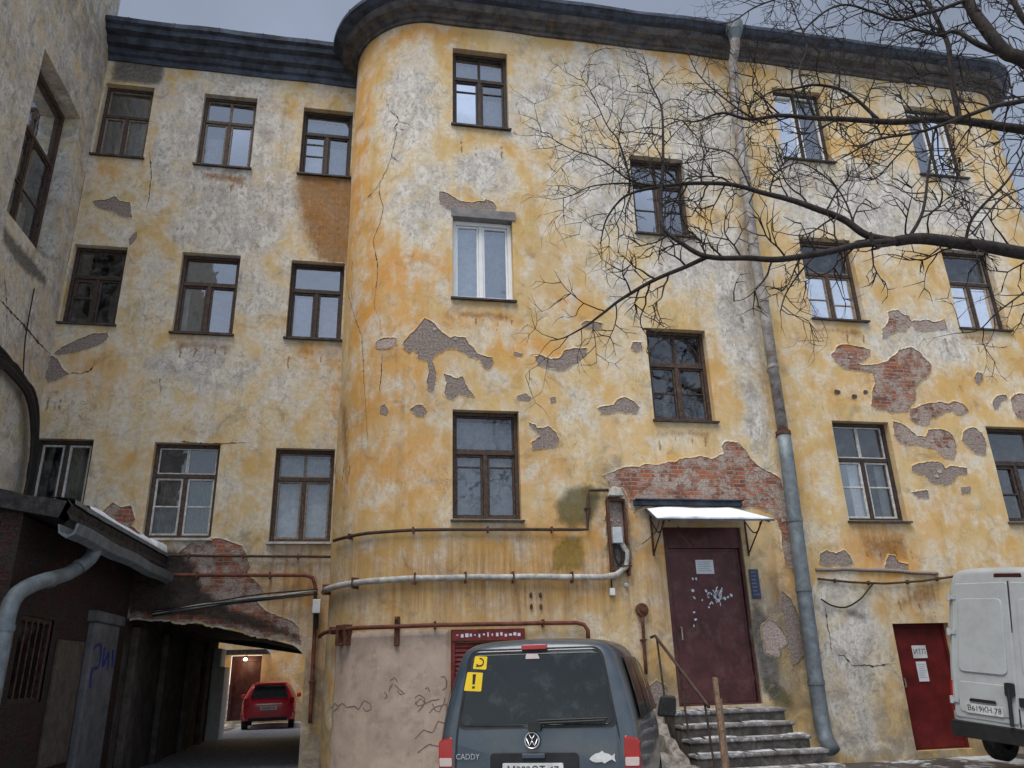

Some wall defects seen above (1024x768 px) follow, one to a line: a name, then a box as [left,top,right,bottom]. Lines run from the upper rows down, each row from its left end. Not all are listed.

crack [346,100,410,439]
crack [1,274,50,354]
spalling [45,331,110,383]
spalling [374,317,494,418]
spalling [513,346,588,372]
spalling [597,396,641,415]
flaking render [830,343,987,500]
flaking render [602,440,794,575]
flaking render [128,536,302,645]
damp [553,539,581,571]
spalling [760,617,789,659]
crack [825,607,896,668]